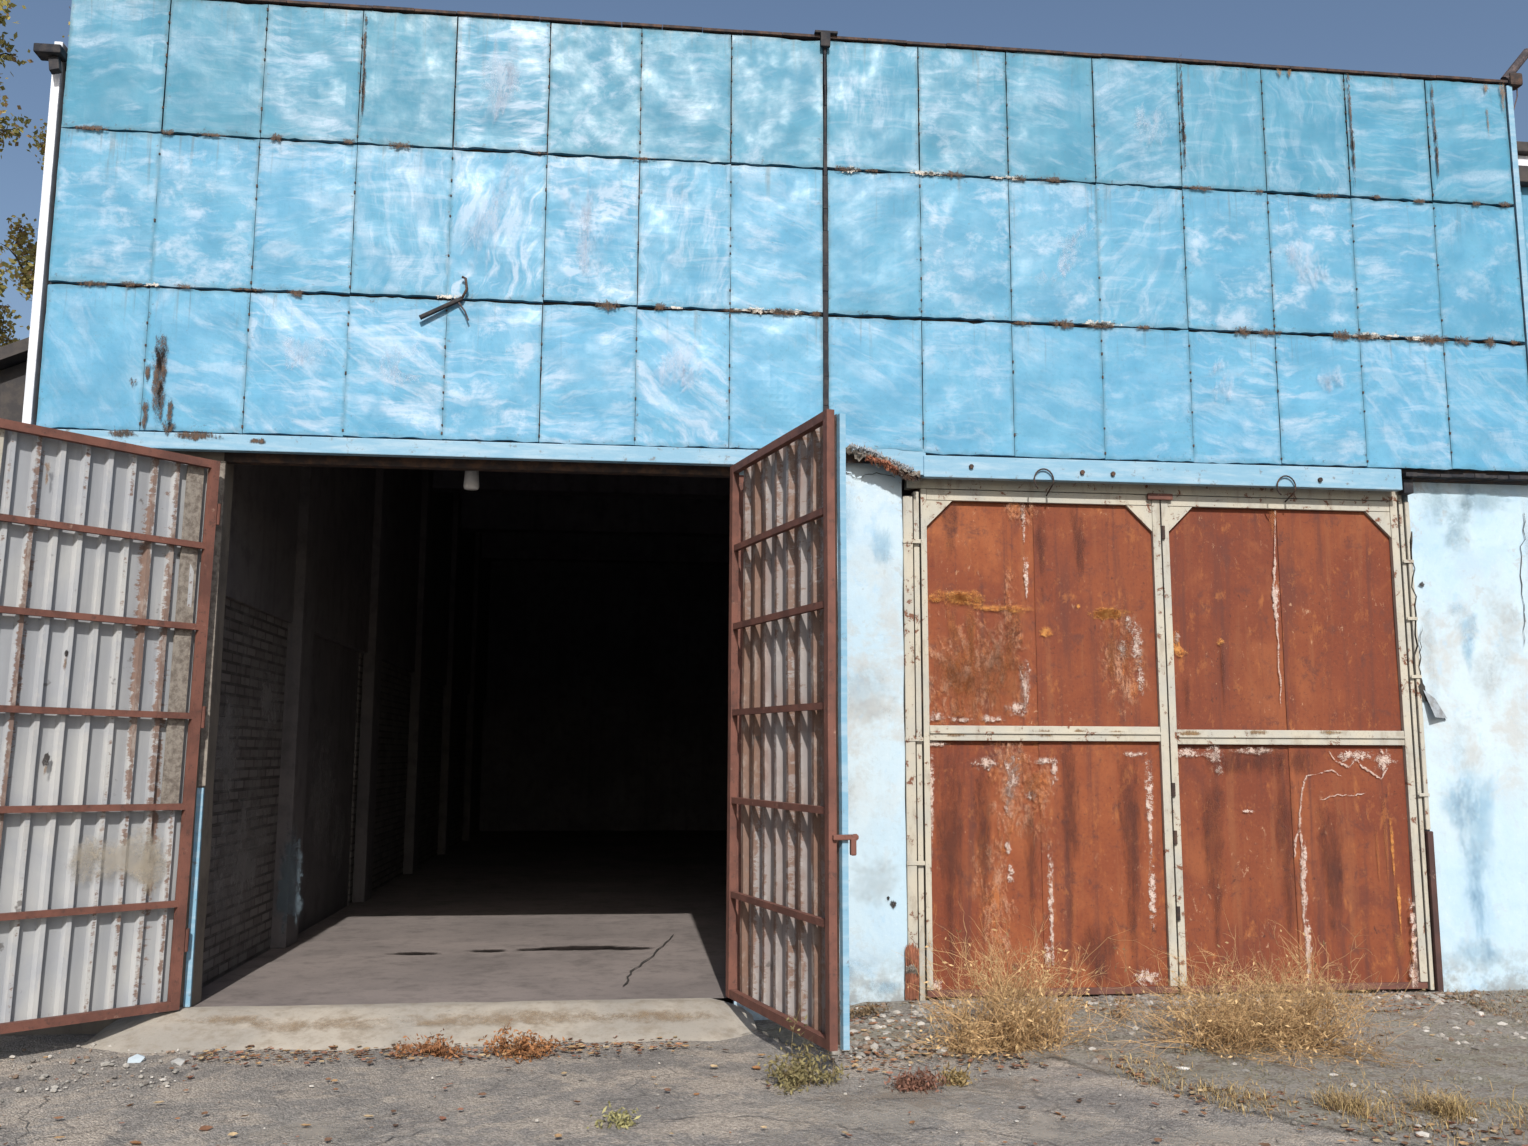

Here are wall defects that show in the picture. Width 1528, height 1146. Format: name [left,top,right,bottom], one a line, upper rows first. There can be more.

corrosion [109,336,220,441]
corrosion [1049,320,1115,330]
corrosion [1235,326,1282,336]
corrosion [1333,329,1519,348]
corrosion [929,576,1024,736]
peeling [929,663,1030,722]
peeling [1178,744,1270,774]
peeling [1045,854,1054,968]
peeling [1126,752,1157,919]
peeling [1294,749,1398,984]
corrosion [1385,823,1401,947]
peeling [1135,969,1158,986]